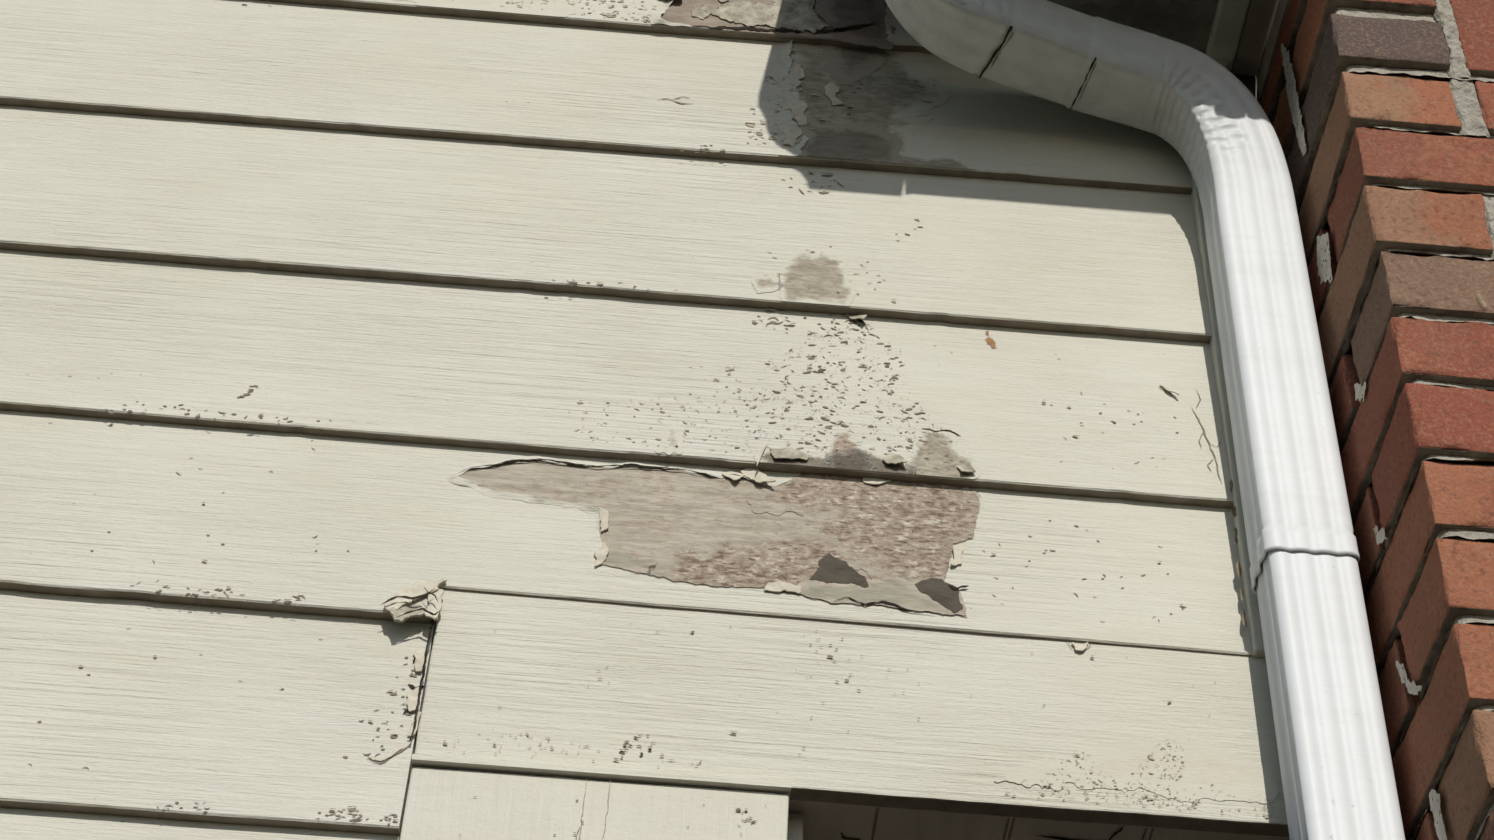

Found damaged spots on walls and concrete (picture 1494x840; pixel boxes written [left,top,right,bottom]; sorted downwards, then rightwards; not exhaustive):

peeling [566,0,975,195]
peeling [448,246,1001,626]
peeling [384,578,447,623]